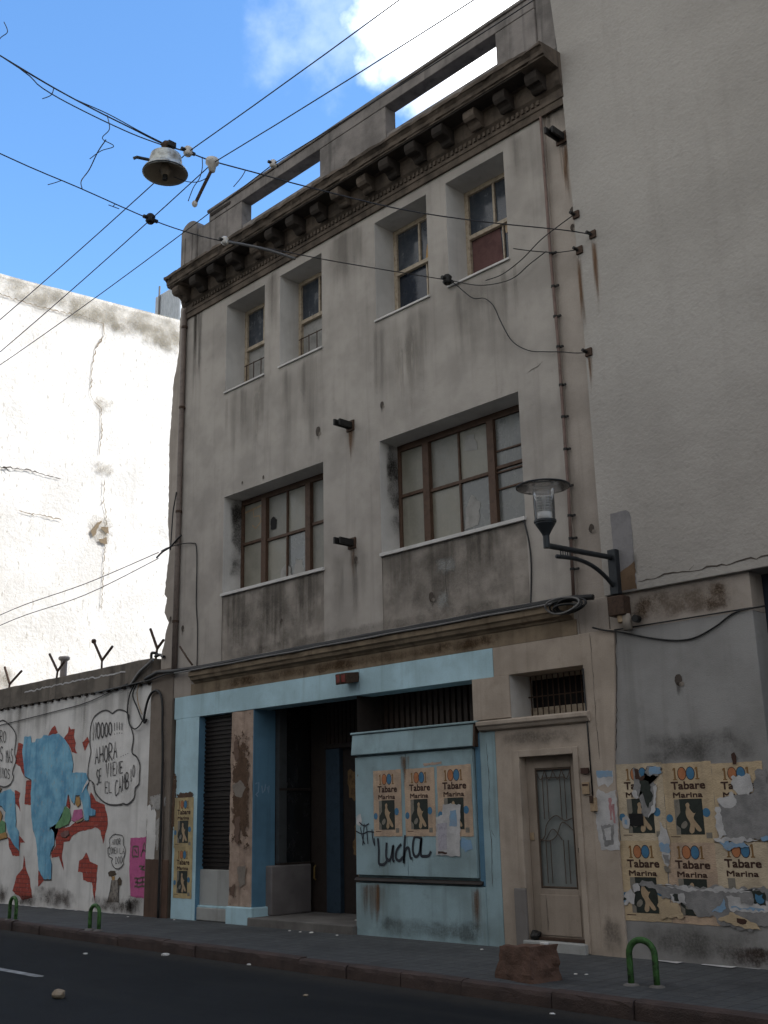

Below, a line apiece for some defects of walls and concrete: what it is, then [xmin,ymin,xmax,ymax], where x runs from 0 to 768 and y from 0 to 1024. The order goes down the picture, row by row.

leakage [0,275,180,346]
crack [1,466,61,479]
flaking render [91,520,109,545]
crack [100,481,108,607]
crack [643,555,768,581]
peeling [231,730,250,849]